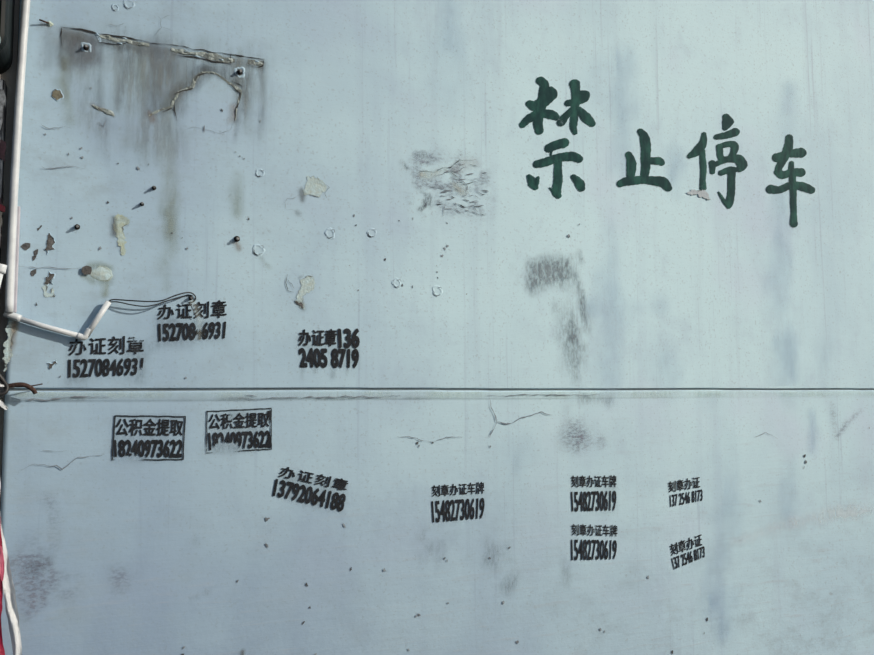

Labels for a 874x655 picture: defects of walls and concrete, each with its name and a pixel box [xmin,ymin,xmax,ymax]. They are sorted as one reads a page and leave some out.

peeling [51,89,64,101]
spalling [60,27,264,134]
peeling [420,159,488,224]
peeling [113,214,130,255]
peeling [21,225,56,306]
peeling [286,275,316,310]
crack [487,394,596,438]
crack [22,450,104,470]